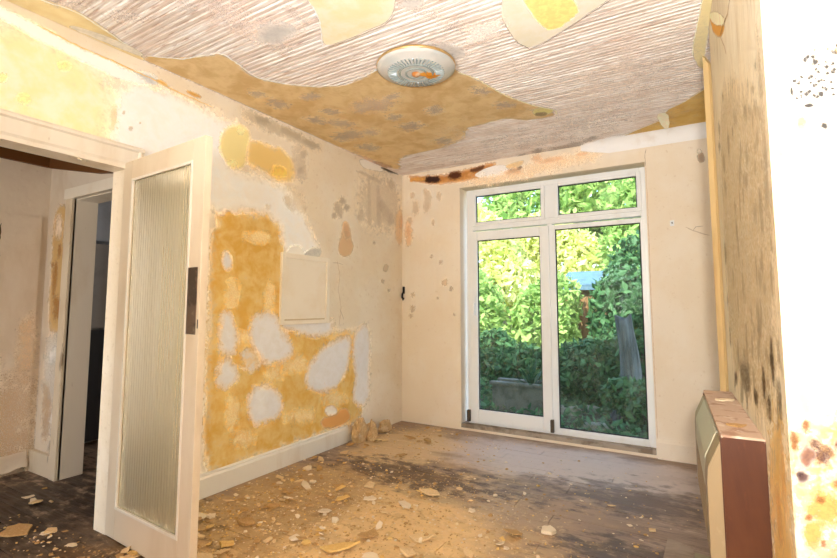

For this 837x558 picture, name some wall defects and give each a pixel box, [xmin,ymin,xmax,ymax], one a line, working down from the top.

peeling [502,0,610,49]
peeling [692,0,730,69]
leakage [790,44,837,131]
peeling [0,0,558,471]
leakage [718,81,837,558]